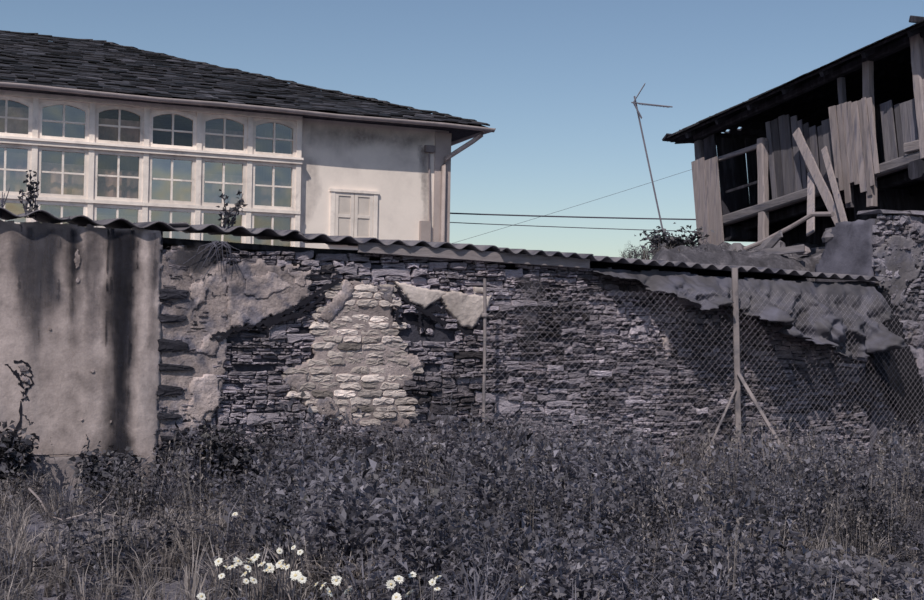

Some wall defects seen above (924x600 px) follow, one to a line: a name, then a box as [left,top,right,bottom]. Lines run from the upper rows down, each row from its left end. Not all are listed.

leakage [13,224,95,320]
leakage [105,228,138,459]
flaking render [156,245,312,450]
flaking render [281,279,492,431]
flaking render [873,231,924,338]